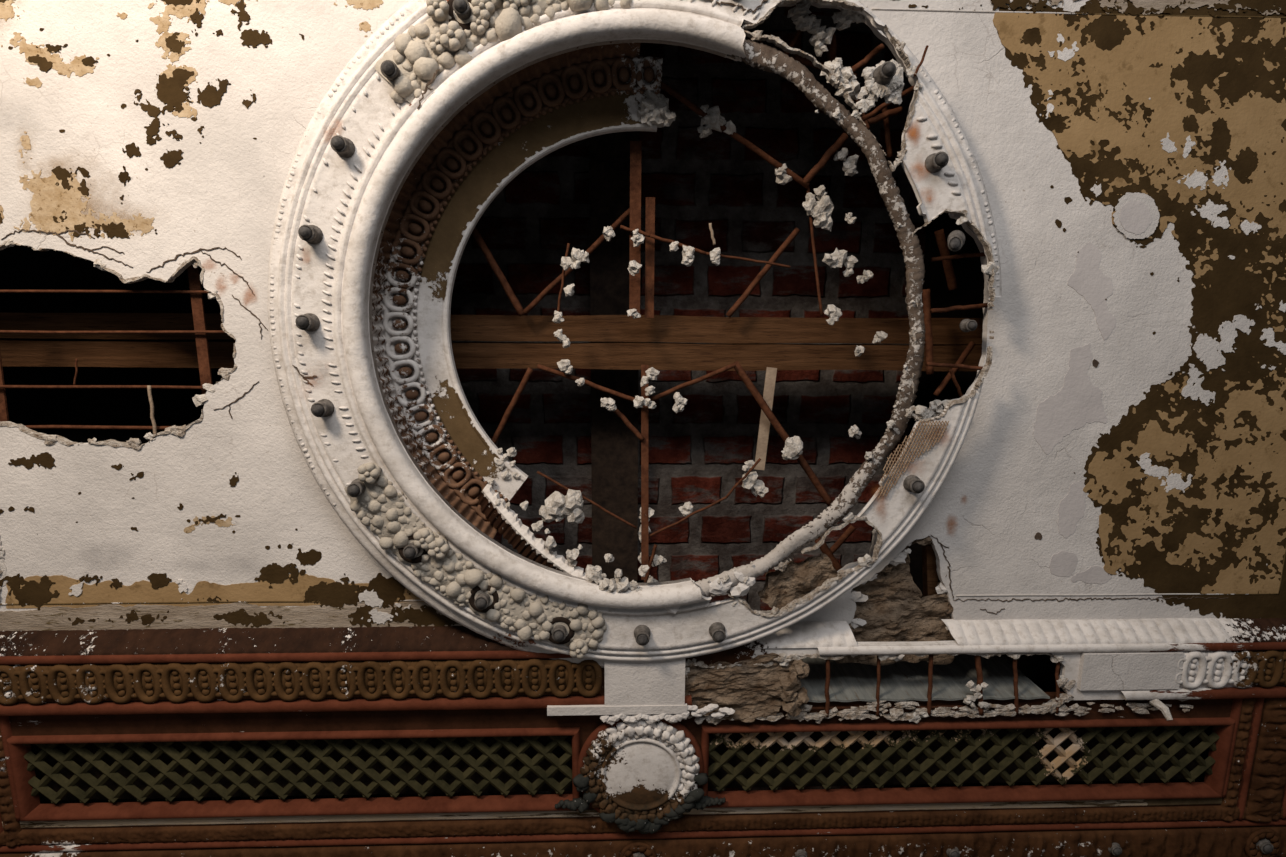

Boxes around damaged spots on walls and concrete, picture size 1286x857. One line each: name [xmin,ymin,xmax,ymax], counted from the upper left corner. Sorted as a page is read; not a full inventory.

peeling [334,0,383,37]
spalling [741,0,923,172]
crack [1,229,268,339]
peeling [0,0,272,469]
spalling [912,209,1000,310]
peeling [980,0,1286,619]
crack [214,381,259,419]
spalling [905,331,994,422]
peeling [111,463,144,481]
peeling [177,503,241,533]
peeling [0,528,463,631]
spalling [685,512,1076,725]